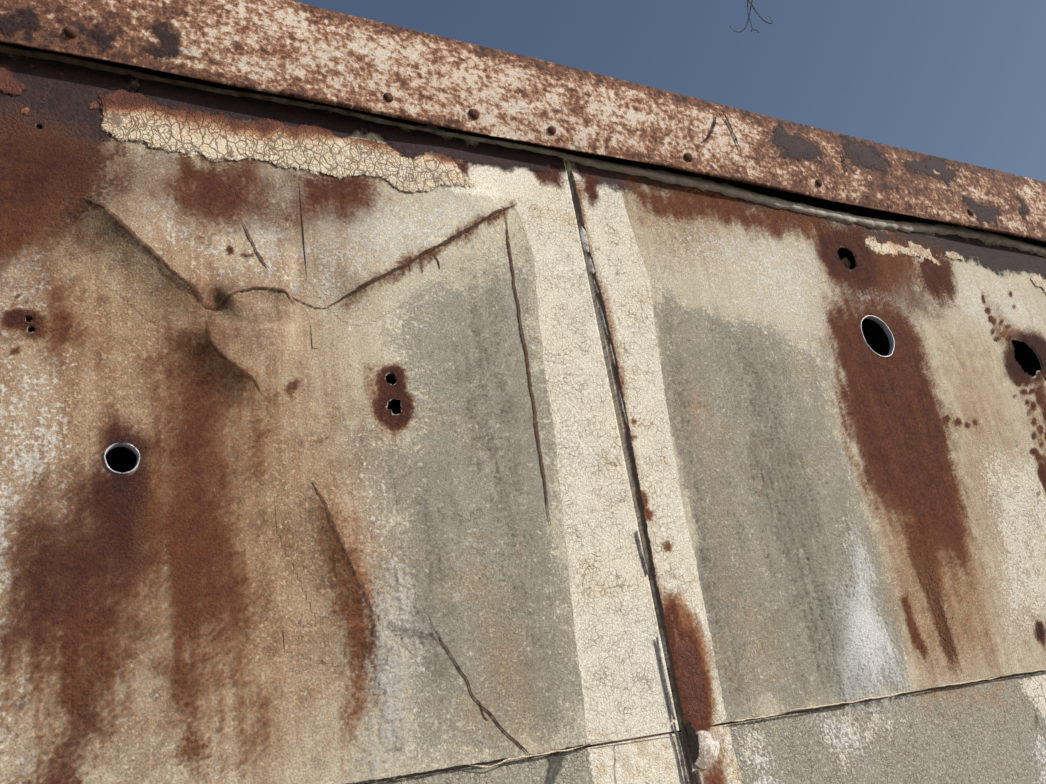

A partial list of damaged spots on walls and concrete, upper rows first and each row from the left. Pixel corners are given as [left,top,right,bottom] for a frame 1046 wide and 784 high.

peeling [143,22,184,60]
rust [171,152,269,257]
rust [286,170,376,221]
peeling [0,52,1046,308]
rust [0,277,274,784]
crack [83,196,551,525]
crack [312,482,376,670]
rust [366,364,414,440]
crack [345,170,694,784]
rust [654,565,716,733]
rust [804,218,978,671]
rust [982,294,1046,494]